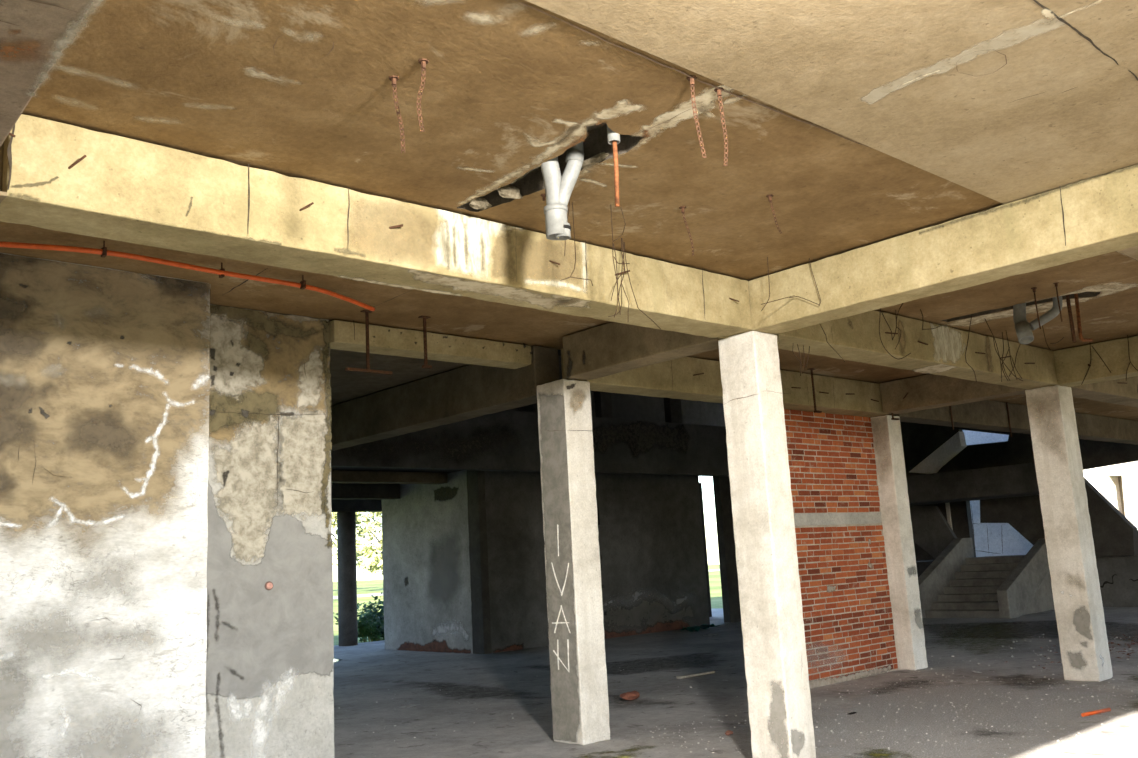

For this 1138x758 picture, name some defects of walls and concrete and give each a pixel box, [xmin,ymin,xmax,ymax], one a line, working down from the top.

spalling [469,185,523,210]
leakage [353,101,642,290]
spalling [581,152,609,168]
leakage [637,85,743,143]
leakage [0,253,330,540]
flaking render [209,314,333,562]